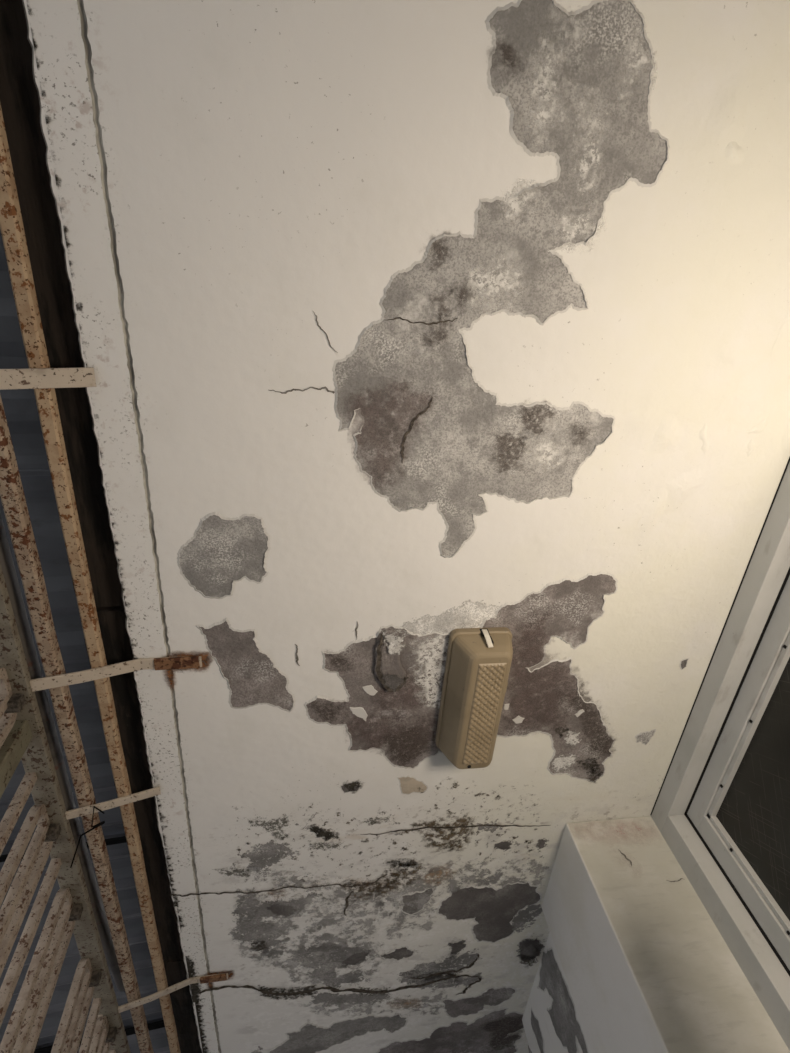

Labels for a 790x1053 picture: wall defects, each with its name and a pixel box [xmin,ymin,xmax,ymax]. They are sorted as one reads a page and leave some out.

peeling [332,0,670,558]
crack [269,386,335,394]
peeling [177,512,271,599]
peeling [195,572,618,795]
leakage [215,783,542,901]
crack [360,825,550,835]
leakage [267,891,298,917]
crack [199,954,481,1000]
leakage [343,950,370,967]
peeling [252,881,589,1053]